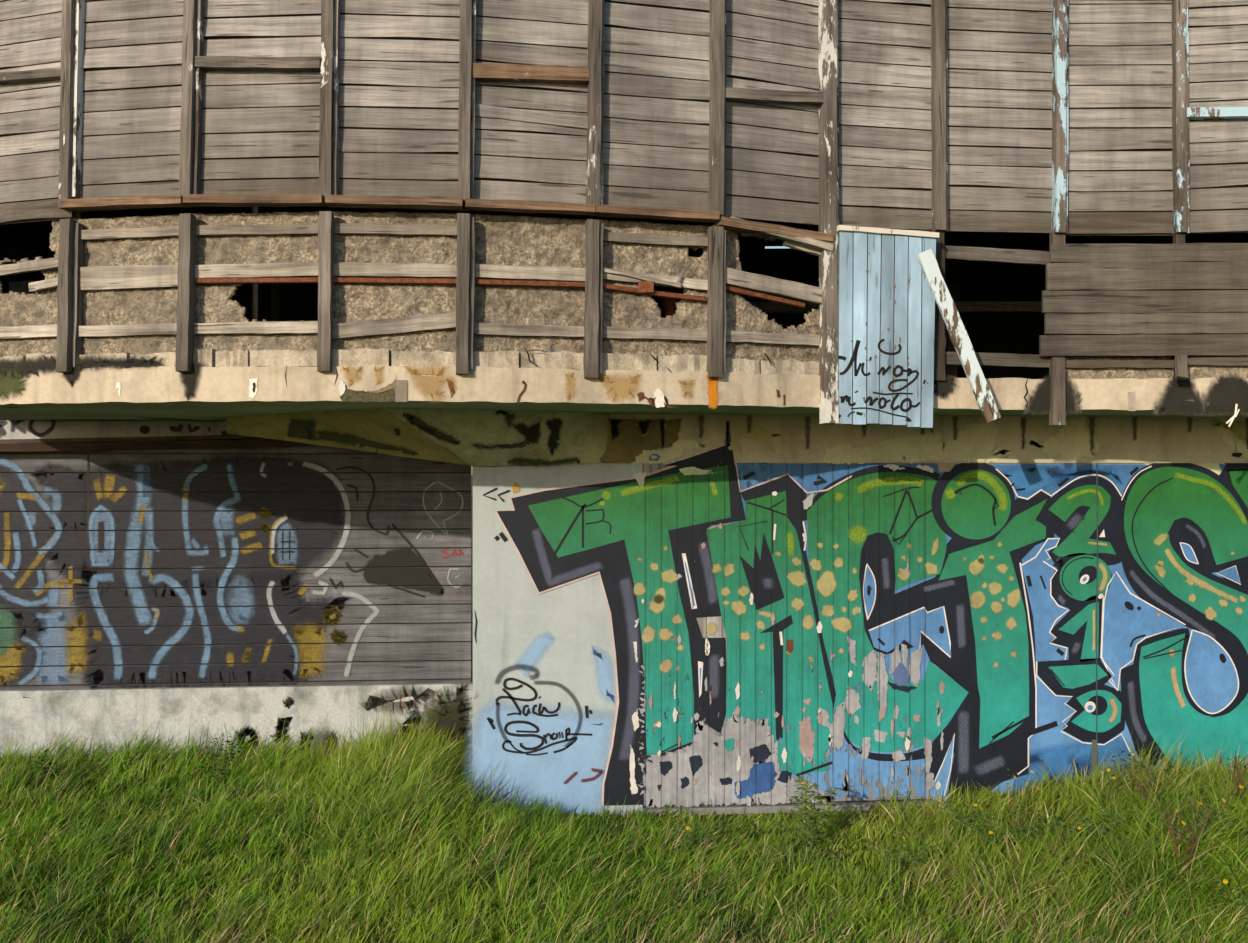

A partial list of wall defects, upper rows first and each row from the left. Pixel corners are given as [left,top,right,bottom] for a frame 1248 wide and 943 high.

leakage [1025,377,1080,413]
leakage [1155,376,1248,415]
peeling [823,415,1009,473]
peeling [1028,416,1100,462]
peeling [1193,463,1225,475]
peeling [629,618,945,808]